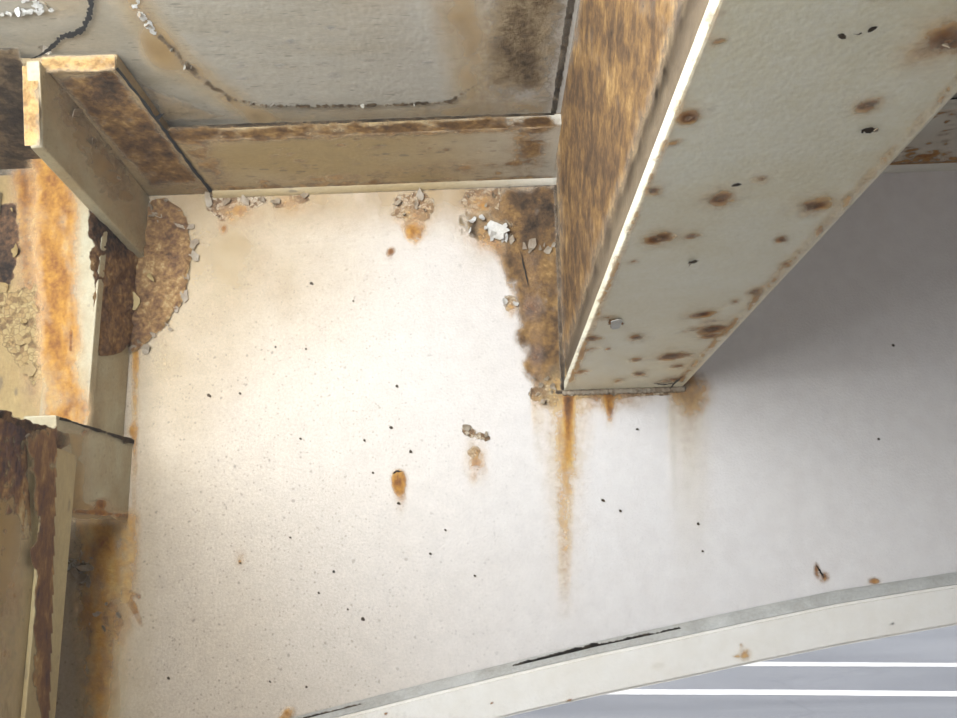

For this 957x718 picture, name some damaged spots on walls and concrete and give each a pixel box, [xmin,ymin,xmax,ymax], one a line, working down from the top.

peeling [0,0,54,17]
crack [31,0,94,59]
leakage [127,0,208,81]
leakage [439,0,565,116]
rust [927,22,957,53]
rust [674,101,698,124]
rust [883,142,957,165]
peeling [459,188,511,246]
rust [41,0,679,551]
peeling [502,295,519,311]
rust [659,311,738,415]
peeling [462,424,490,467]